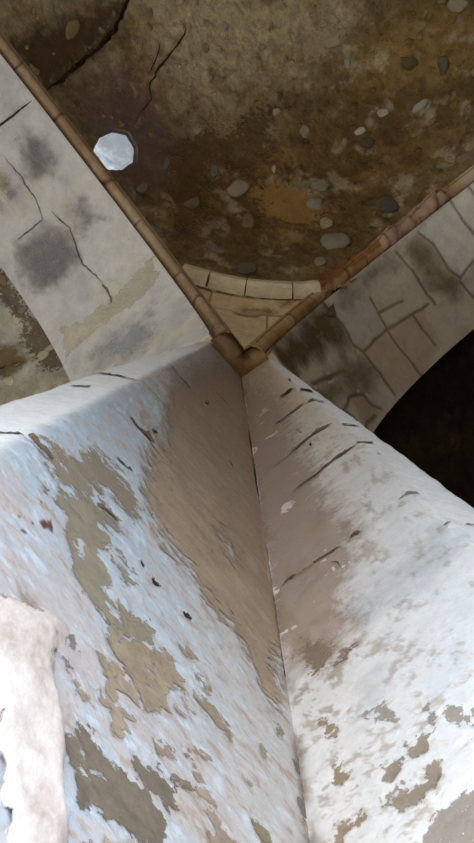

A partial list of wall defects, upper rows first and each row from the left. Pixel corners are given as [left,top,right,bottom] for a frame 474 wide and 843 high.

crack [47,0,130,90]
crack [138,21,187,116]
crack [0,101,31,127]
leakage [20,232,78,285]
crack [5,158,112,304]
leakage [272,305,346,377]
flaking render [28,343,359,742]
flaking render [64,721,237,843]
flaking render [331,756,351,786]
flaking render [334,808,367,843]
flaking render [379,702,474,814]
flaking render [422,789,474,843]